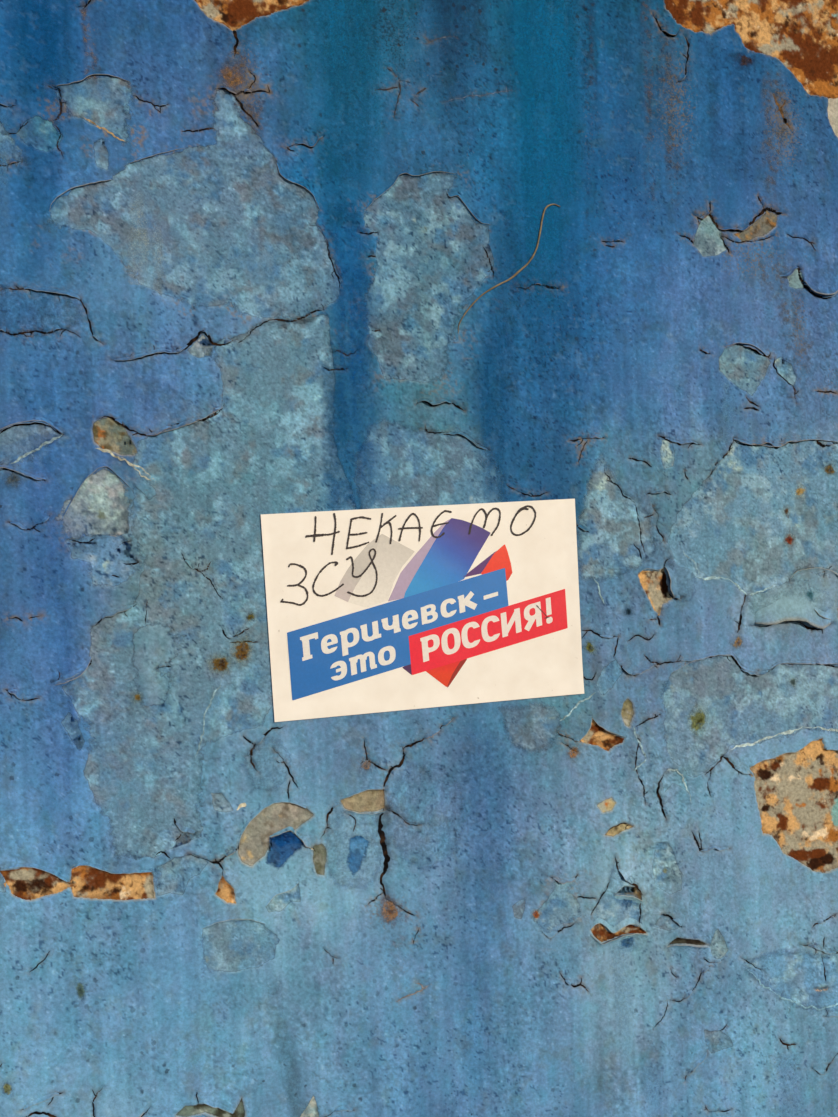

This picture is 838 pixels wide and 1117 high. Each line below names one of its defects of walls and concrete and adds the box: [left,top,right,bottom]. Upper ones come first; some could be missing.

rust [195,0,309,31]
rust [664,0,838,99]
peeling [0,116,62,165]
peeling [719,340,797,396]
peeling [0,416,63,480]
peeling [48,71,502,875]
crack [570,434,838,566]
crack [582,566,838,680]
rust [0,862,155,900]
crack [298,718,453,944]
crack [609,714,667,830]
rust [749,734,838,873]